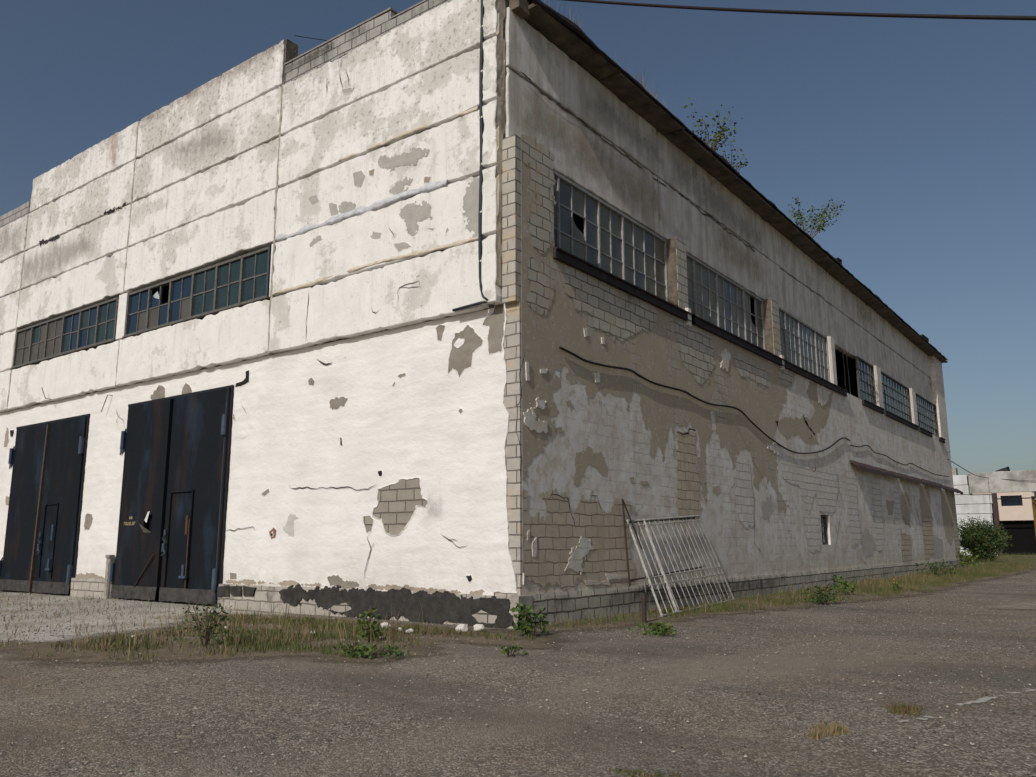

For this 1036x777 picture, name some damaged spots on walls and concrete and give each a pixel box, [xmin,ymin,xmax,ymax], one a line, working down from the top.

peeling [308,194,357,217]
peeling [353,147,432,253]
peeling [460,177,479,238]
flaking render [435,303,506,378]
peeling [521,134,838,592]
flaking render [362,470,429,537]
peeling [886,486,960,563]